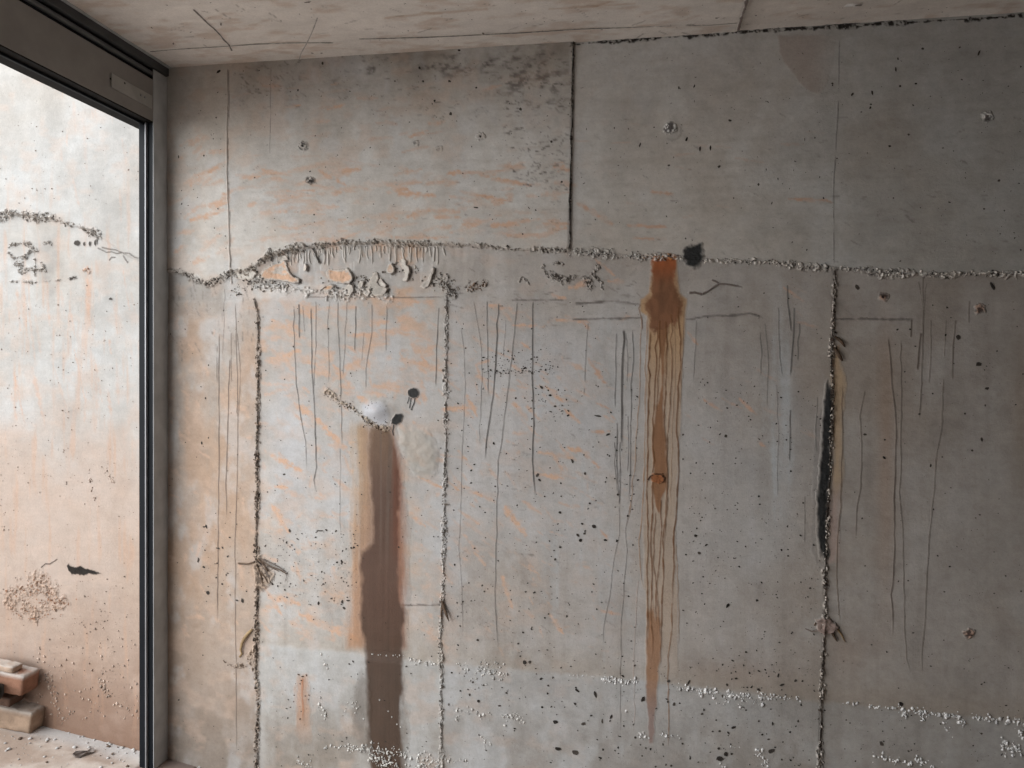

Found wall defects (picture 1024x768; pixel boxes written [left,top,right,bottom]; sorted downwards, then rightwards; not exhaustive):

crack [150,9,333,768]
water stain [292,299,413,768]
peeling [166,237,683,305]
rust [627,252,688,746]
crack [358,0,1024,768]
spalling [703,257,1024,281]